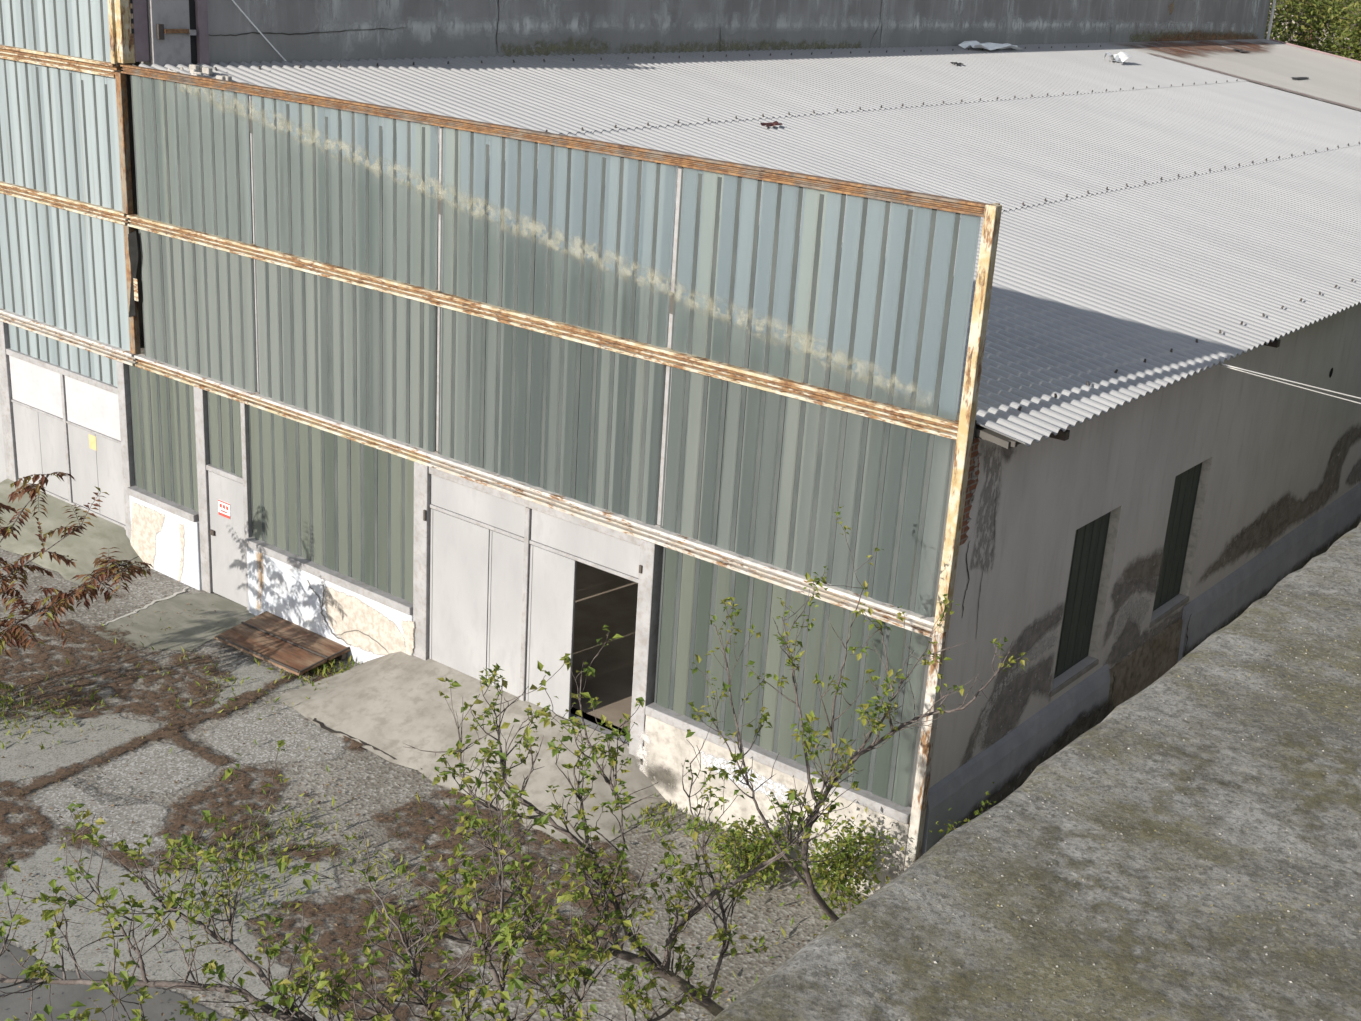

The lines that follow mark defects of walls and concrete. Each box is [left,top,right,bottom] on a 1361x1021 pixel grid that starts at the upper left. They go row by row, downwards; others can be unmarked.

rust [1126,31,1360,110]
peeling [130,502,185,582]
peeling [959,438,1001,571]
leakage [1201,427,1361,580]
crack [307,580,388,653]
leakage [962,605,1064,765]
leakage [1105,551,1186,664]
spalling [1108,618,1183,712]